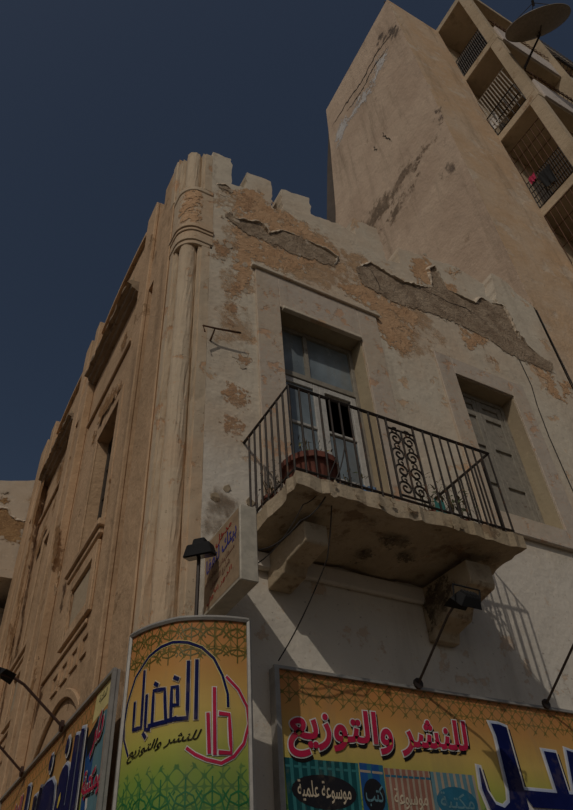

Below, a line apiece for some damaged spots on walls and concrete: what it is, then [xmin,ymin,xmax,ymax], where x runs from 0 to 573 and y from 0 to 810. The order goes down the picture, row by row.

crack [333,25,397,124]
spalling [208,183,573,403]
peeling [219,380,251,442]
spalling [0,497,26,545]